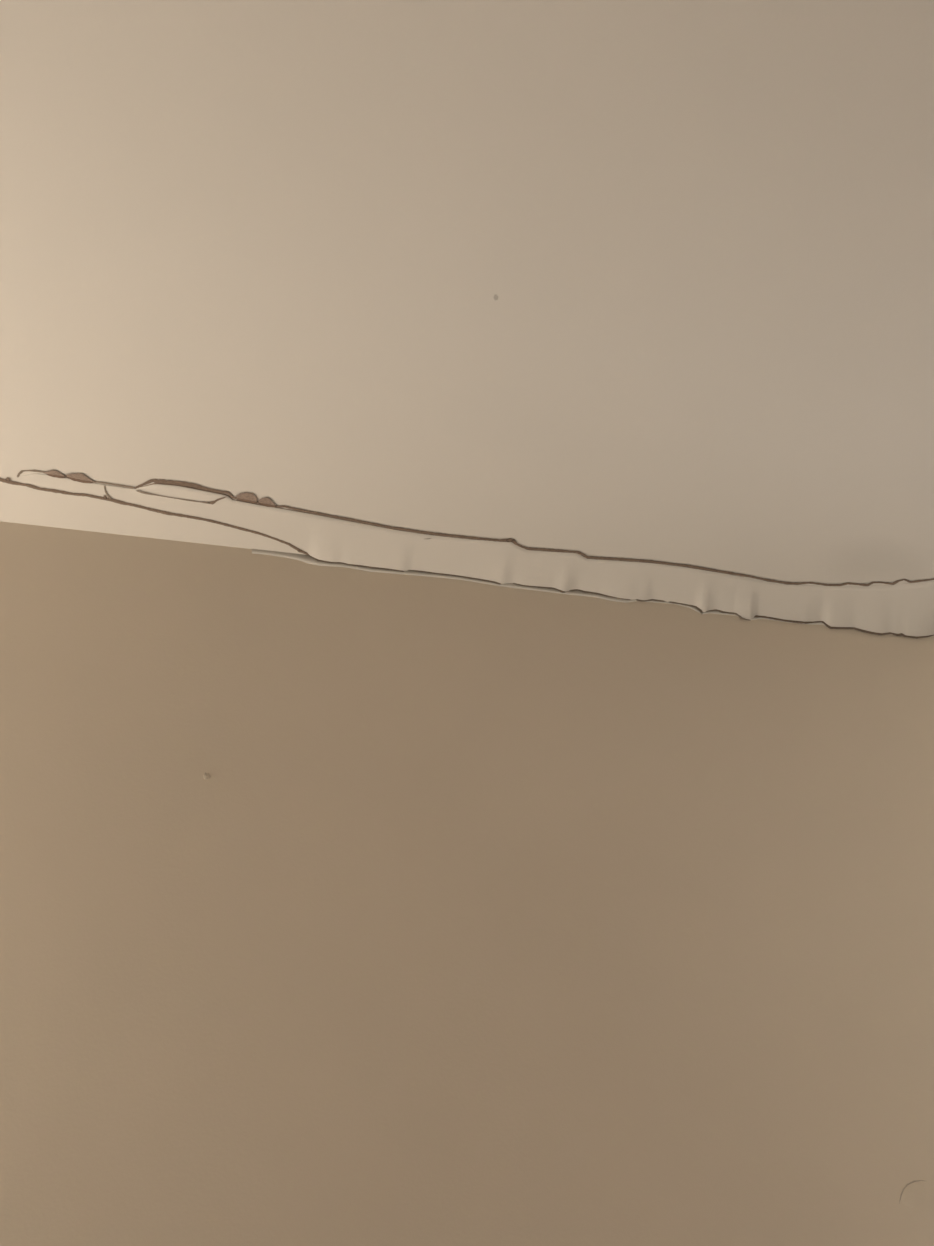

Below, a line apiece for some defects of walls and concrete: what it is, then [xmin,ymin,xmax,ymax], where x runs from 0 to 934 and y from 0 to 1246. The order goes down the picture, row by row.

crack [0,470,934,639]